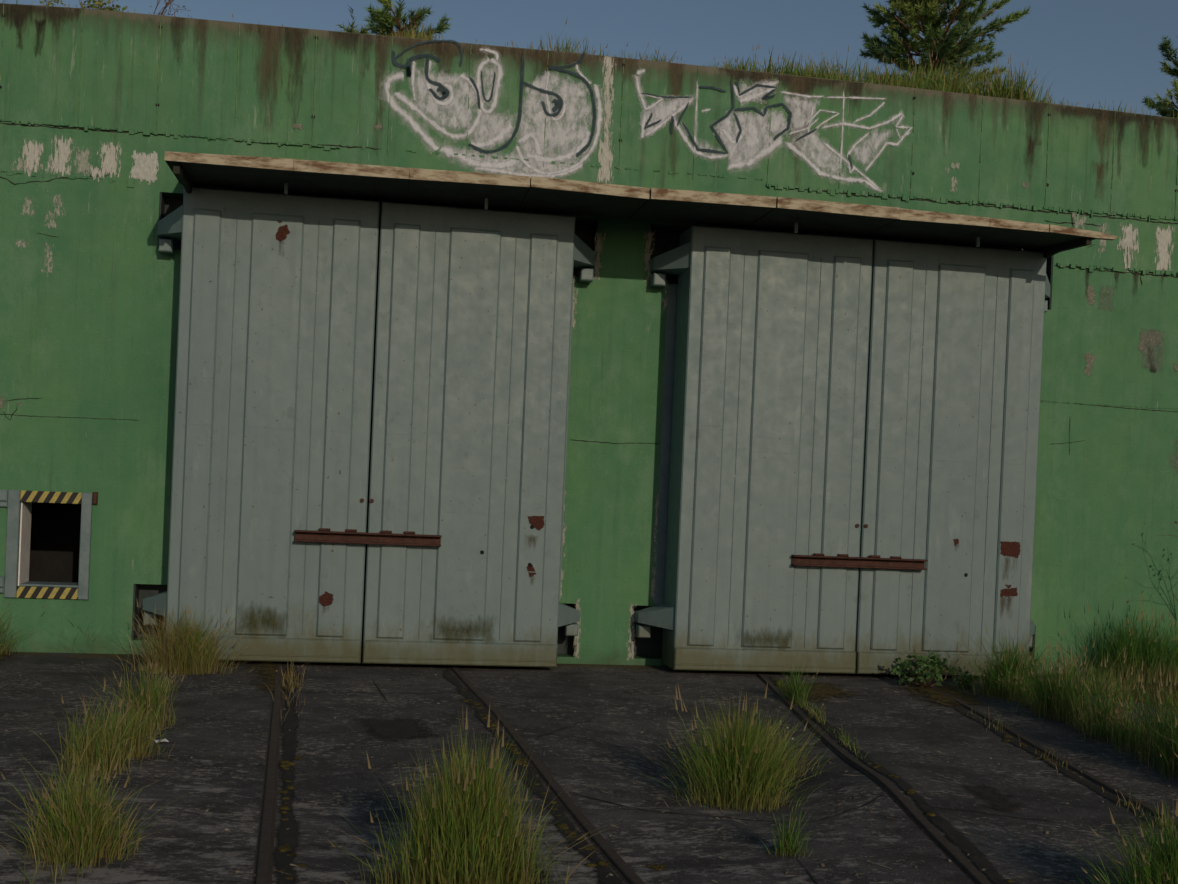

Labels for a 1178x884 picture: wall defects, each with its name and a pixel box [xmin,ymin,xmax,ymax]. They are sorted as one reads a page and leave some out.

damp [0,3,79,43]
damp [285,27,304,83]
peeling [12,134,159,185]
crack [2,123,194,138]
crack [286,142,377,150]
damp [1058,106,1178,155]
crack [0,175,107,185]
rust [275,220,290,243]
peeling [1098,223,1139,272]
peeling [1154,225,1175,271]
rust [528,516,544,541]
rust [1000,541,1021,566]